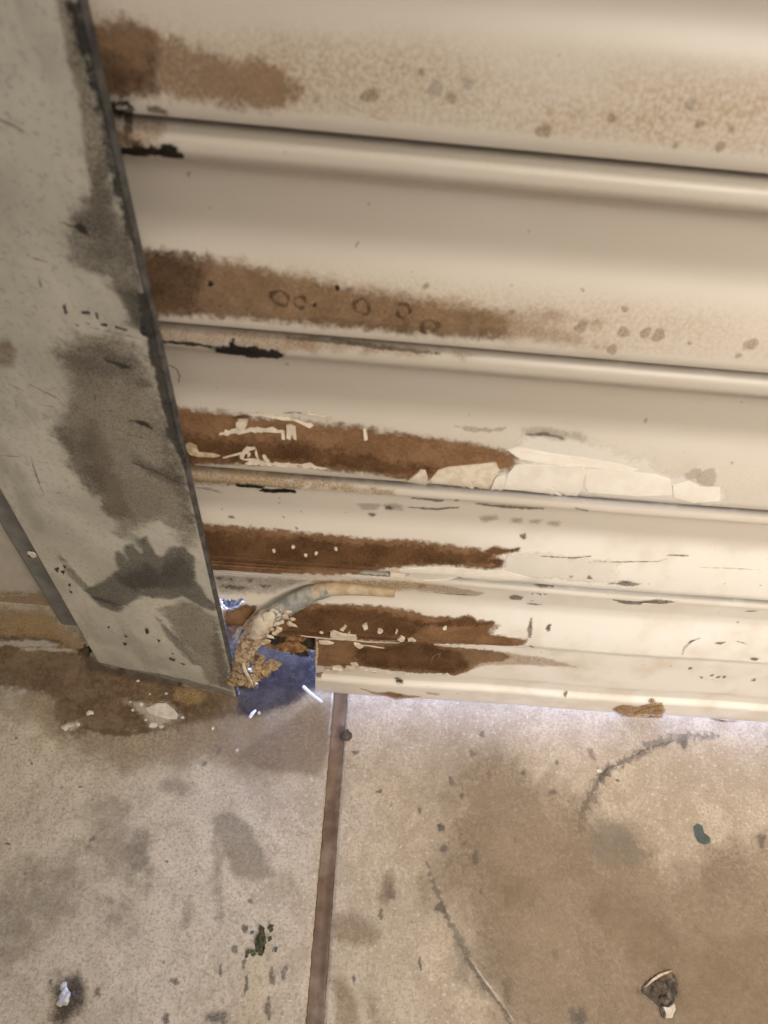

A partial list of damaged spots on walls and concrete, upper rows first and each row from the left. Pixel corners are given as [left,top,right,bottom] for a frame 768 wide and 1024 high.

rust [95,12,303,108]
rust [144,251,570,341]
peeling [138,293,334,470]
rust [178,408,515,491]
peeling [398,447,720,503]
rust [203,523,519,596]
water stain [0,592,330,773]
peeling [261,610,297,645]
rust [224,603,563,688]
rust [613,699,665,718]